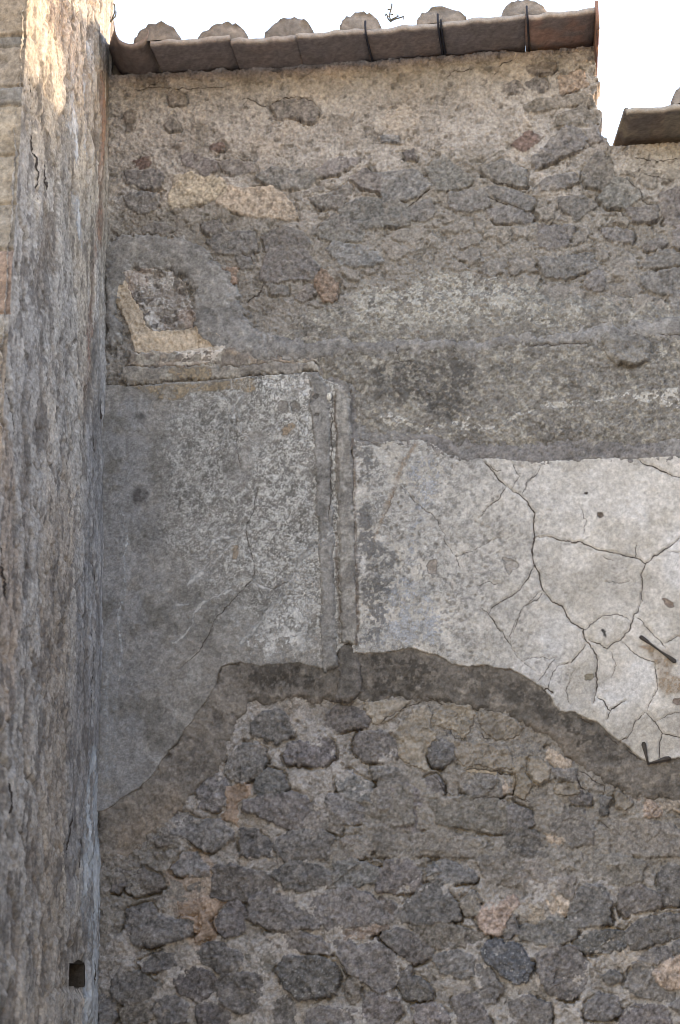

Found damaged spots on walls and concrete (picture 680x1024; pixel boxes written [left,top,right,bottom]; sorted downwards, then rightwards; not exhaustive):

peeling [115,268,226,366]
spalling [278,400,300,413]
crack [172,395,333,663]
crack [384,492,494,567]
crack [479,463,680,760]
crack [381,696,442,723]
peeling [363,698,581,800]
peeling [177,896,227,944]